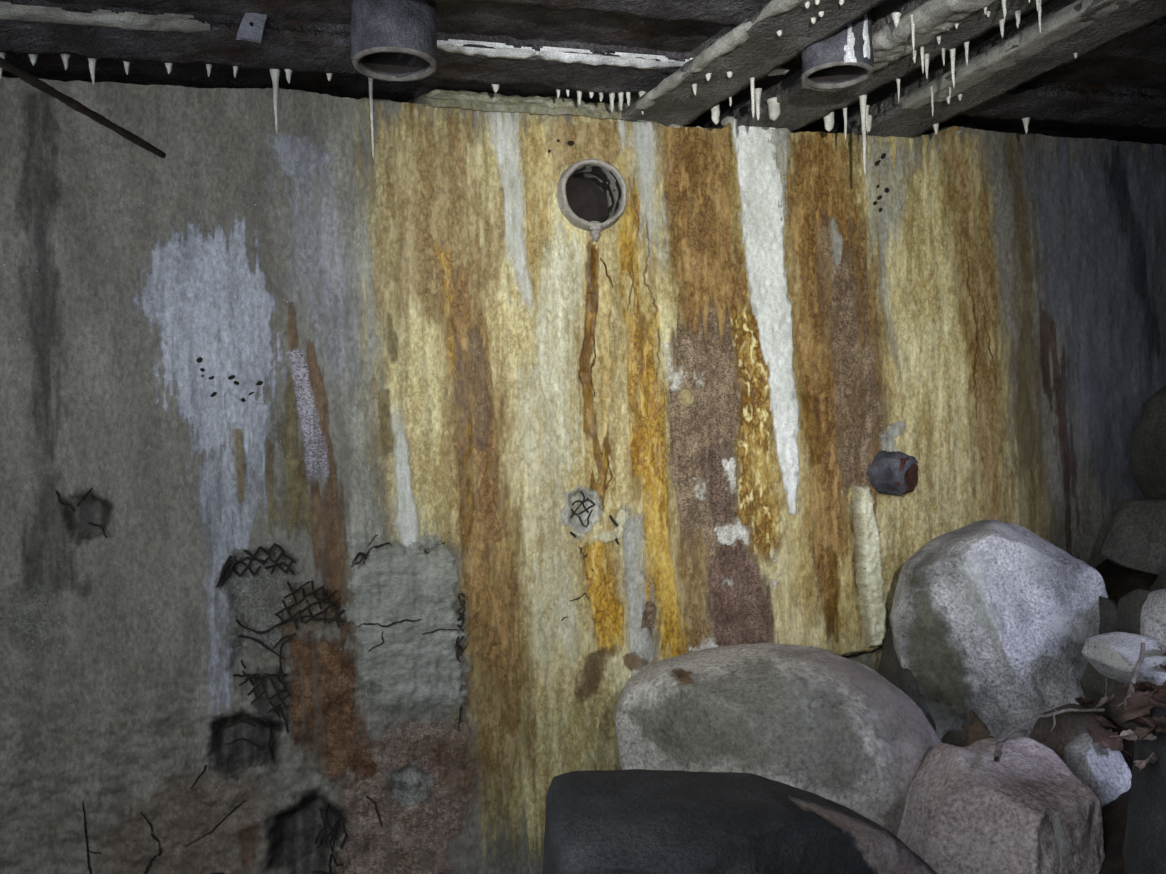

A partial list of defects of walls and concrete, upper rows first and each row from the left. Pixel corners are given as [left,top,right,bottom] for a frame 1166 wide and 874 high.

leakage [767,66,845,92]
leakage [843,0,997,71]
spalling [190,543,345,790]
crack [351,534,445,567]
rust [374,108,527,692]
leakage [360,0,802,856]
spalling [561,487,629,545]
rust [522,112,774,659]
rust [786,131,889,647]
leakage [728,119,1040,673]